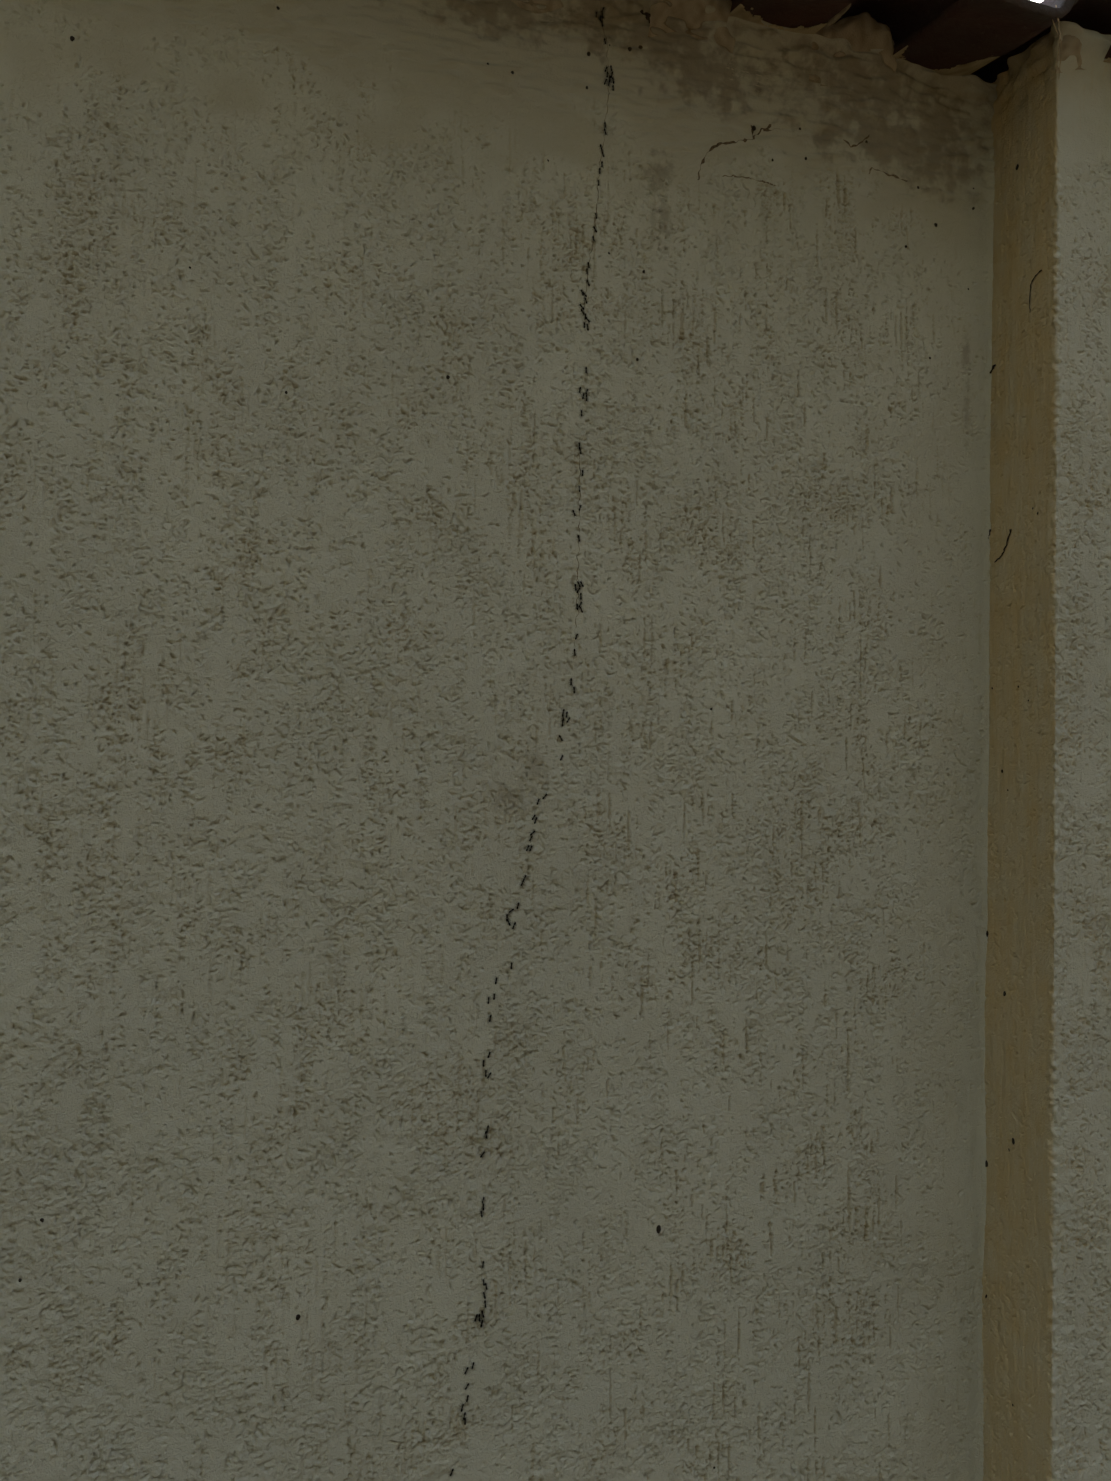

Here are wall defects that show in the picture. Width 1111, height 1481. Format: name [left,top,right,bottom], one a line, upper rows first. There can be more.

crack [698,124,776,186]